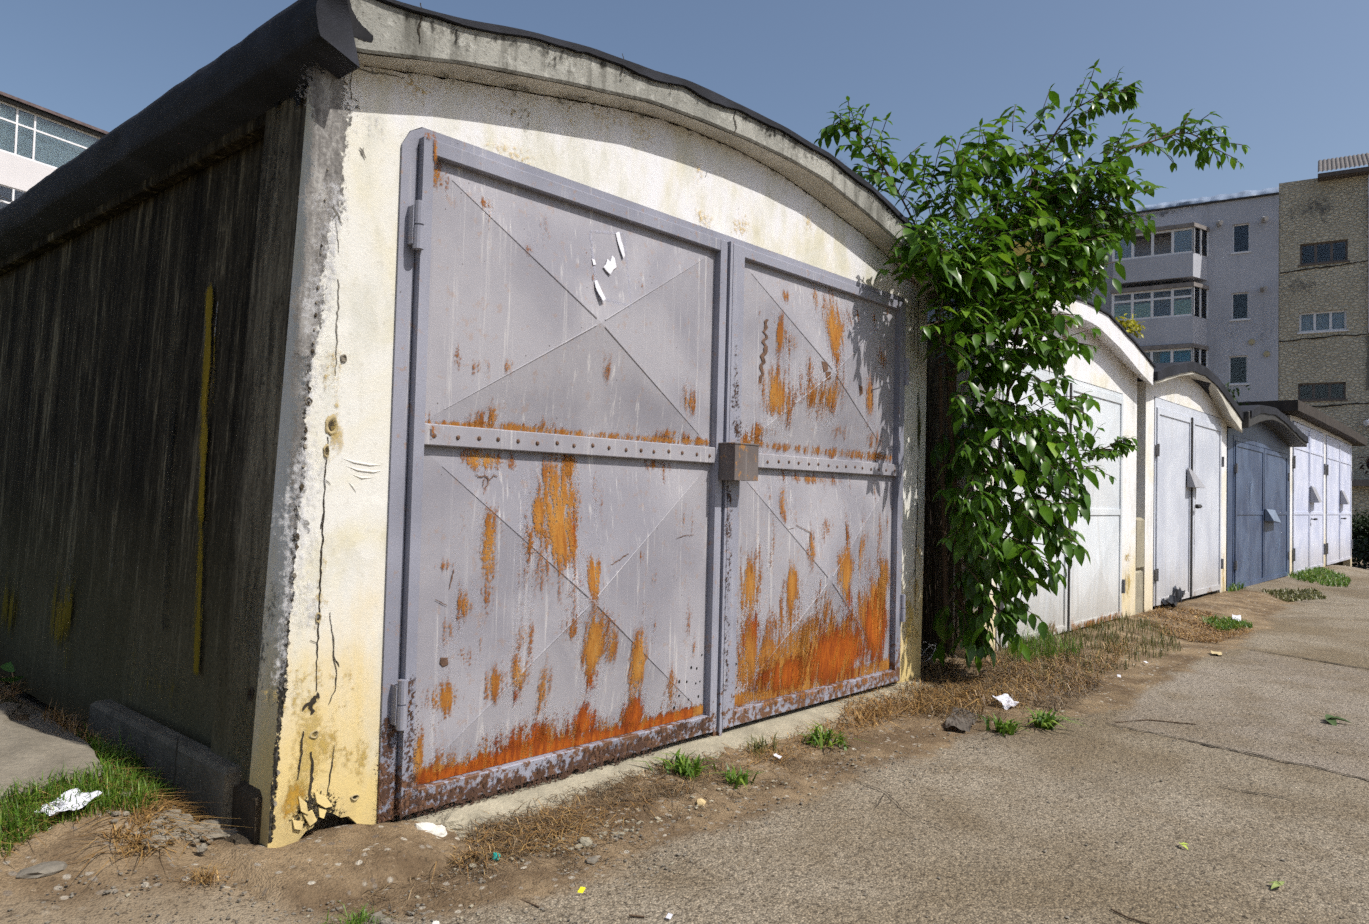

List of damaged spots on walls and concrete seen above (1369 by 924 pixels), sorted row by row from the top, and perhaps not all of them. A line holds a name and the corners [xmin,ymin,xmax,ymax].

rust [425,132,449,188]
rust [425,399,708,446]
rust [461,449,514,471]
rust [374,453,716,823]